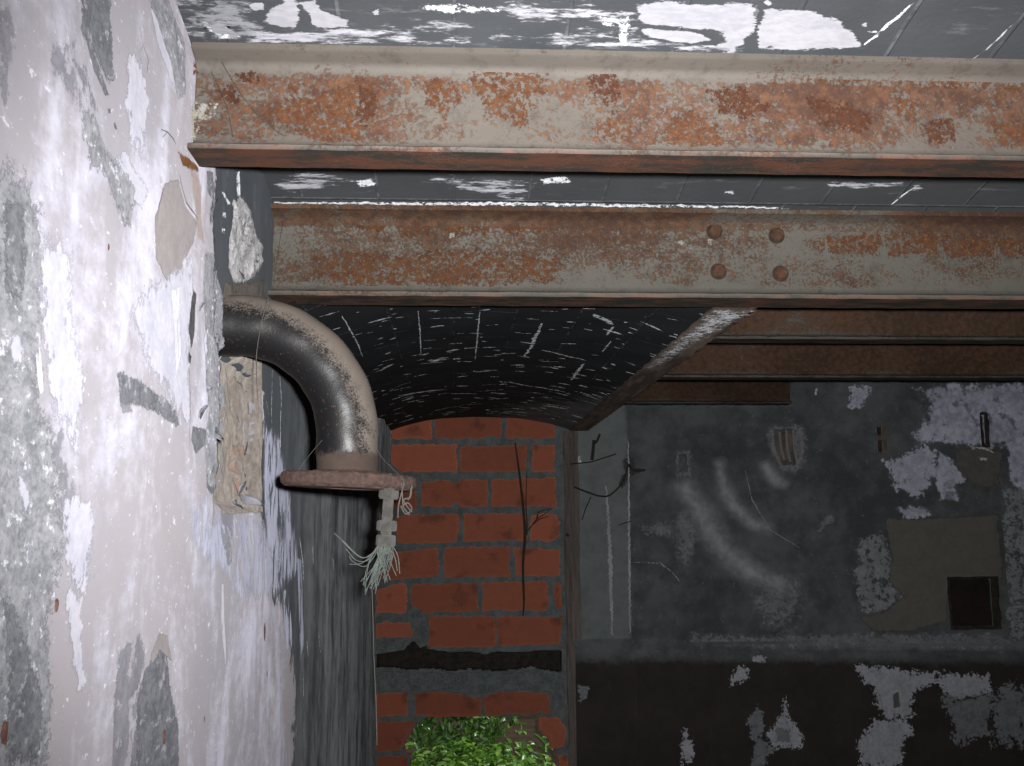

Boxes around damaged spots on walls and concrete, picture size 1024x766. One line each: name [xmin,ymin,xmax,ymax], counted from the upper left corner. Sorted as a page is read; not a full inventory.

peeling [52,0,136,228]
rust [264,79,379,143]
rust [424,71,548,130]
rust [587,74,632,142]
rust [661,78,770,147]
rust [803,79,1024,144]
spalling [207,171,264,283]
rust [307,225,563,287]
spalling [117,253,264,565]
peeling [0,157,75,766]
peeling [113,633,179,766]
peeling [855,662,1024,766]